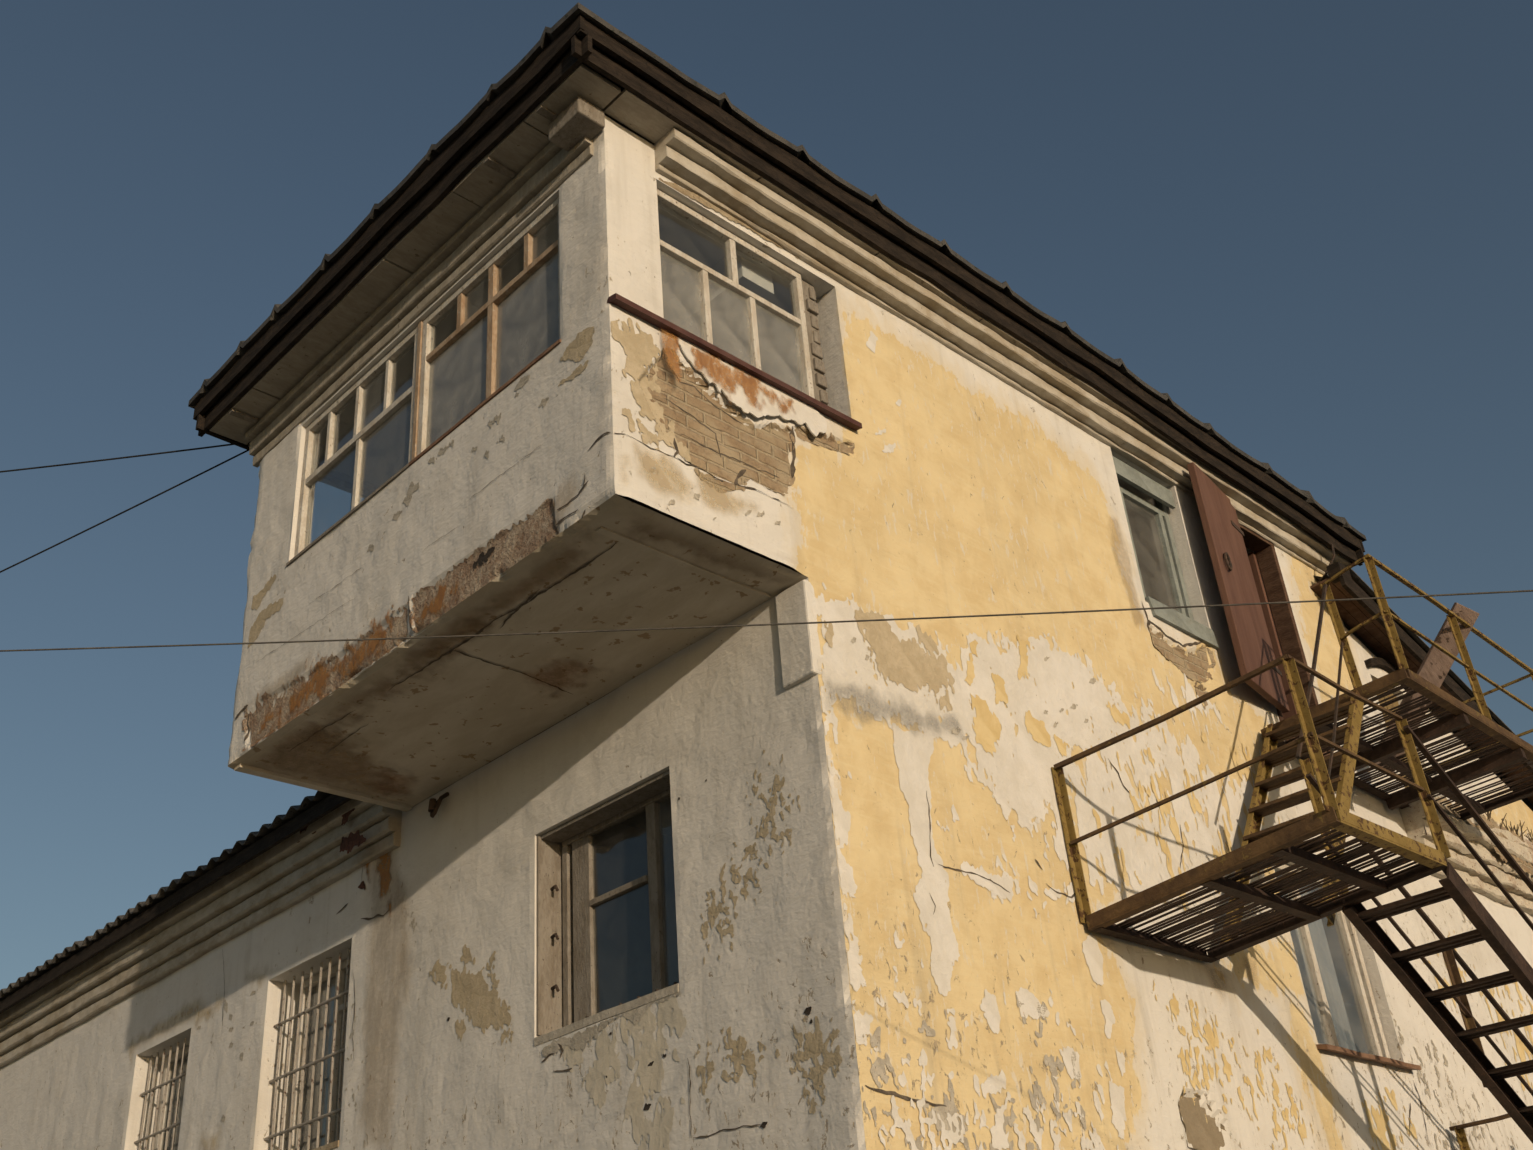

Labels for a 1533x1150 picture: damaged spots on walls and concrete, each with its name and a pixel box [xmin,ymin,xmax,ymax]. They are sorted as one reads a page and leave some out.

peeling [471,413,505,459]
flaking render [539,318,855,500]
peeling [393,482,419,520]
spalling [242,498,559,747]
flaking render [340,808,366,854]
peeling [542,583,1313,1150]
peeling [429,944,514,1045]